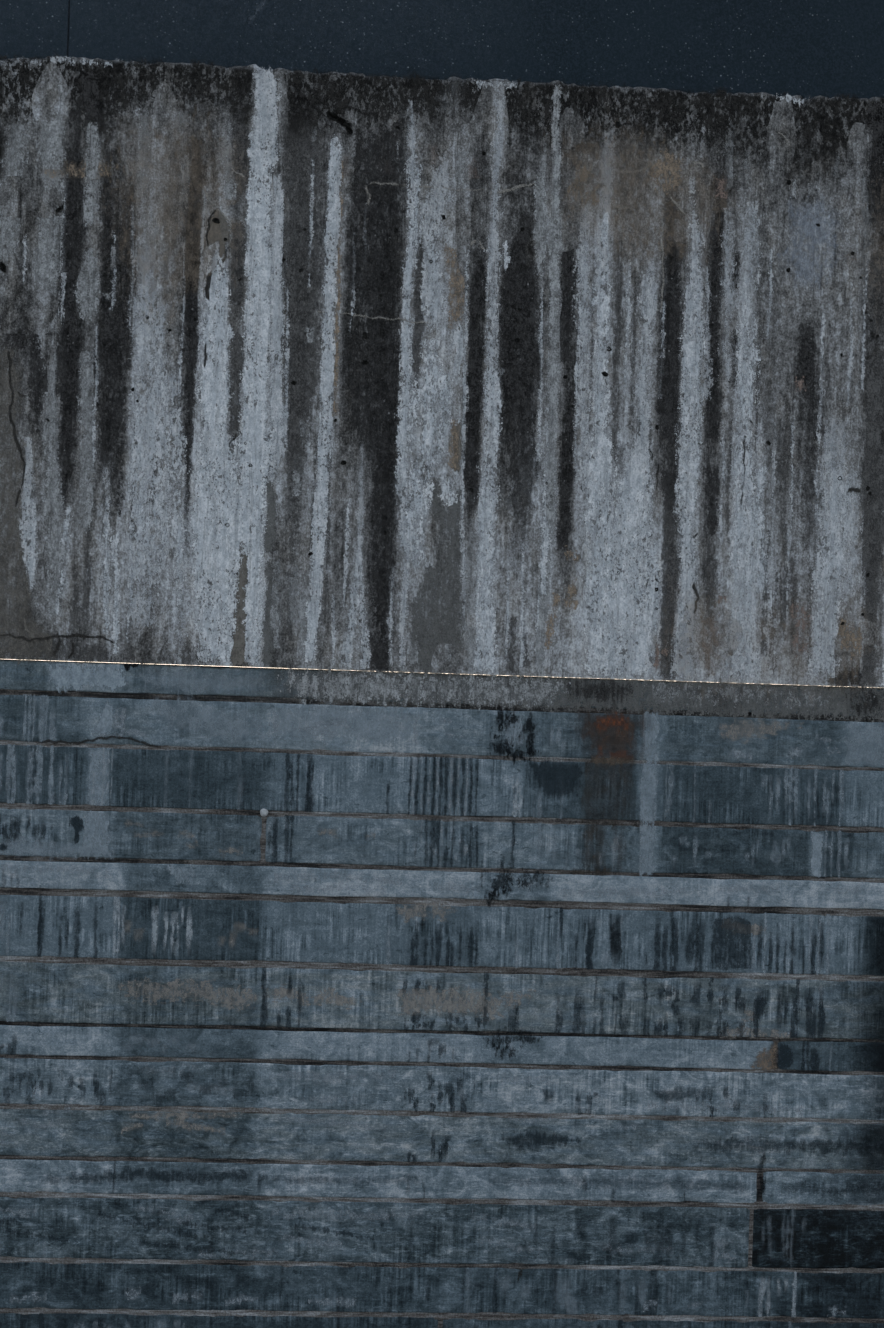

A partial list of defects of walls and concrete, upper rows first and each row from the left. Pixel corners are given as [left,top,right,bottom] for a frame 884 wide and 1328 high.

damp [0,69,371,669]
damp [386,81,884,686]
damp [699,1125,884,1167]